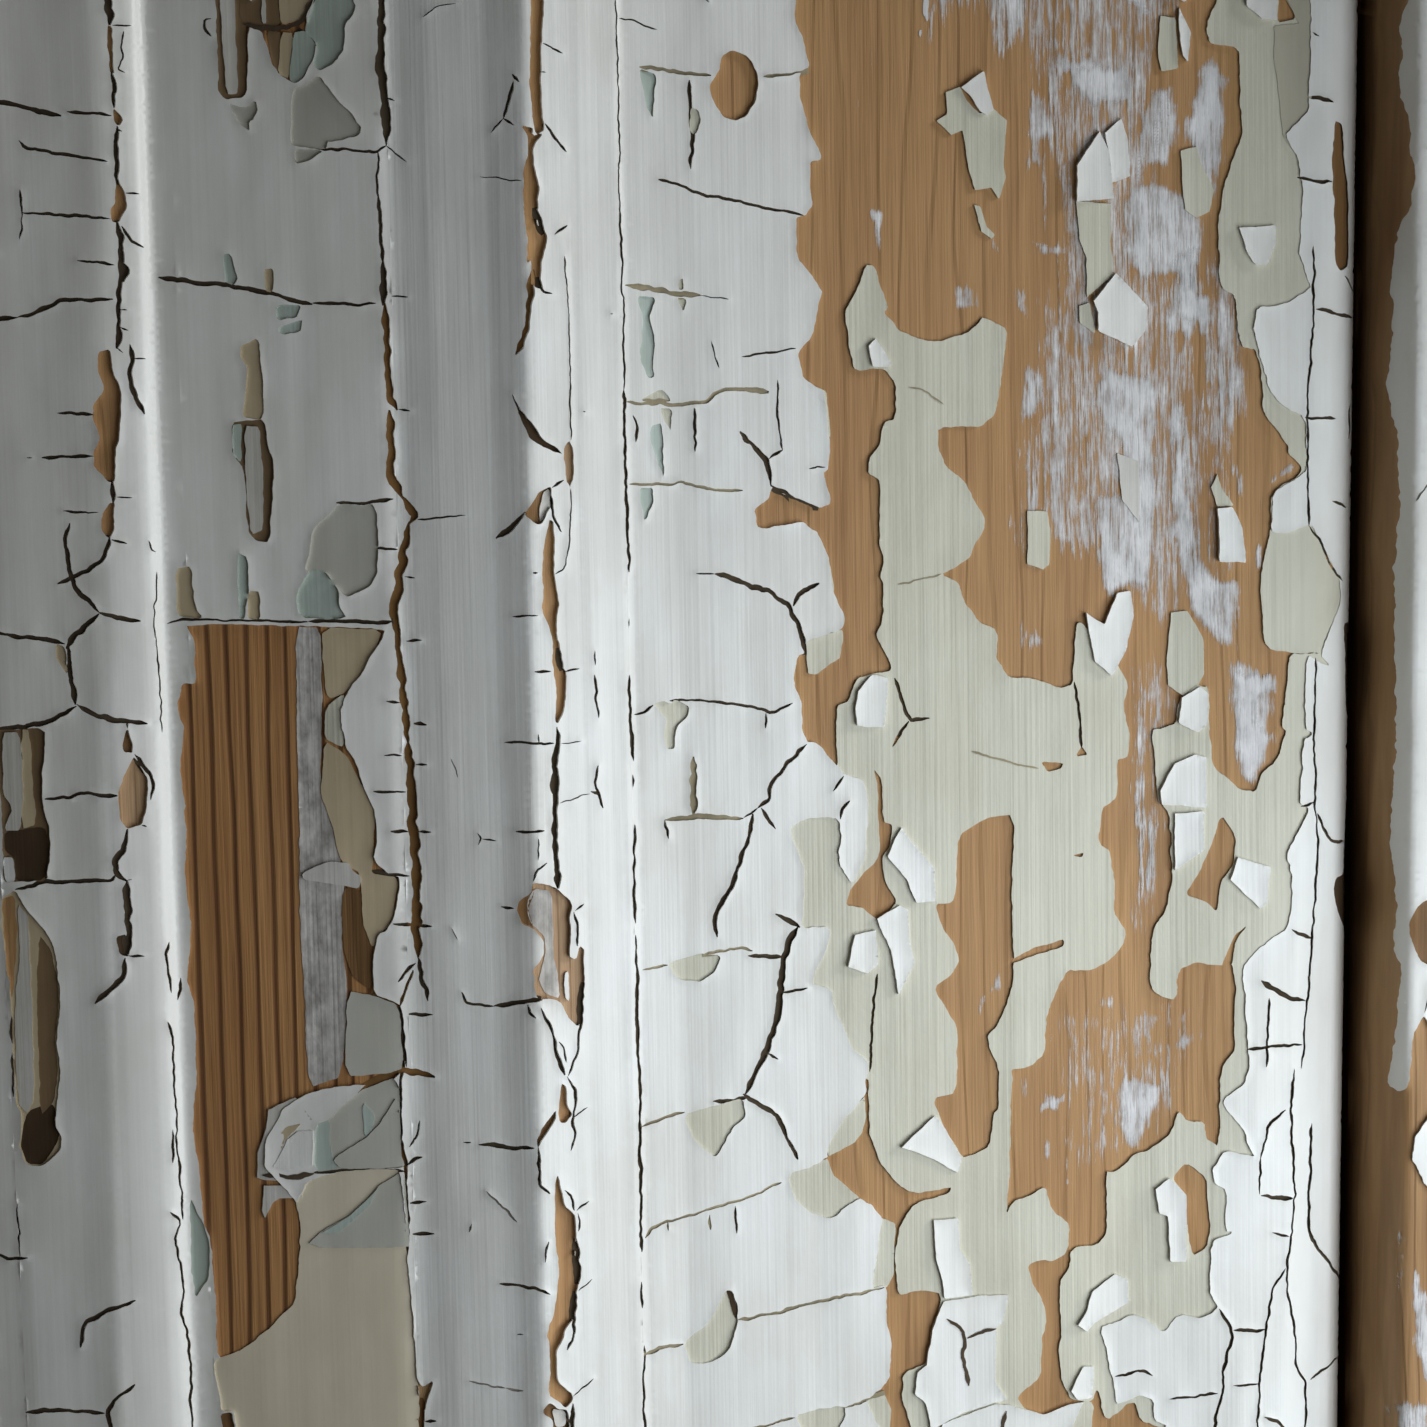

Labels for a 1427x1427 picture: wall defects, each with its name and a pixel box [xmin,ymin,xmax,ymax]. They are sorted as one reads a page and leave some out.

peeling [215,0,361,163]
crack [611,4,823,571]
peeling [710,51,758,120]
peeling [0,728,61,1166]
crack [0,0,590,1427]
peeling [175,504,432,1427]
peeling [517,883,584,1024]
crack [477,648,792,944]
crack [632,745,806,1306]
crack [696,572,819,655]
peeling [755,0,1427,1427]
crack [1115,658,1343,1427]